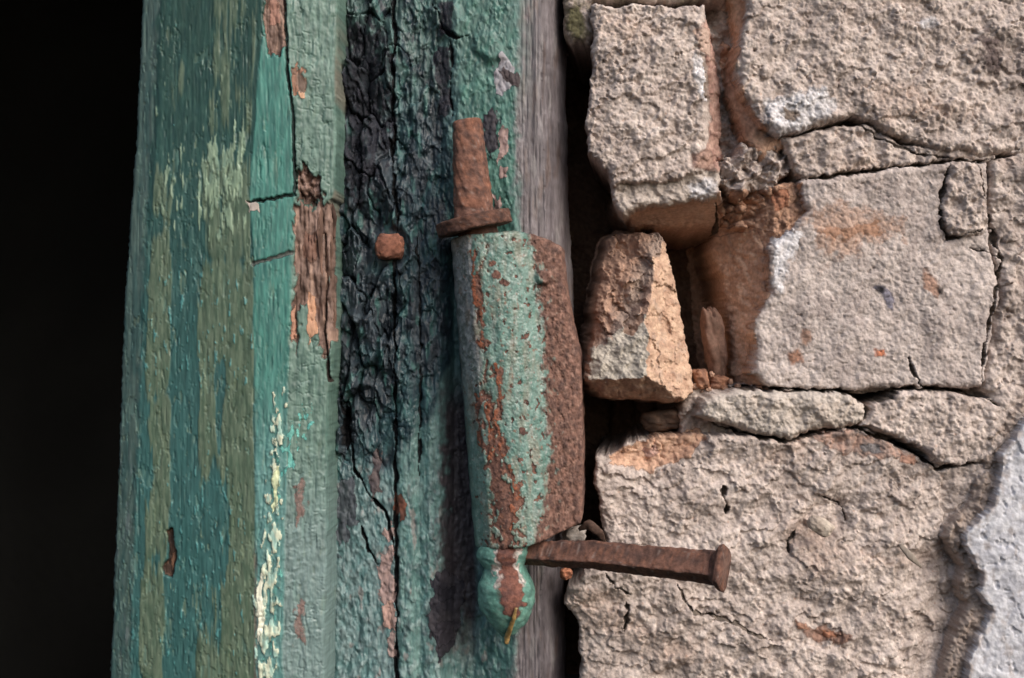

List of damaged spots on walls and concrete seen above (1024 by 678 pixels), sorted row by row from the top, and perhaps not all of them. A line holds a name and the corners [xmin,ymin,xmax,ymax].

peeling [263,0,287,57]
peeling [494,51,520,96]
crack [245,193,294,213]
crack [252,250,294,266]
peeling [290,162,339,359]
crack [795,117,1003,366]
rust [470,234,548,619]
spalling [596,407,706,474]
peeling [163,528,177,576]
peeling [252,387,314,678]